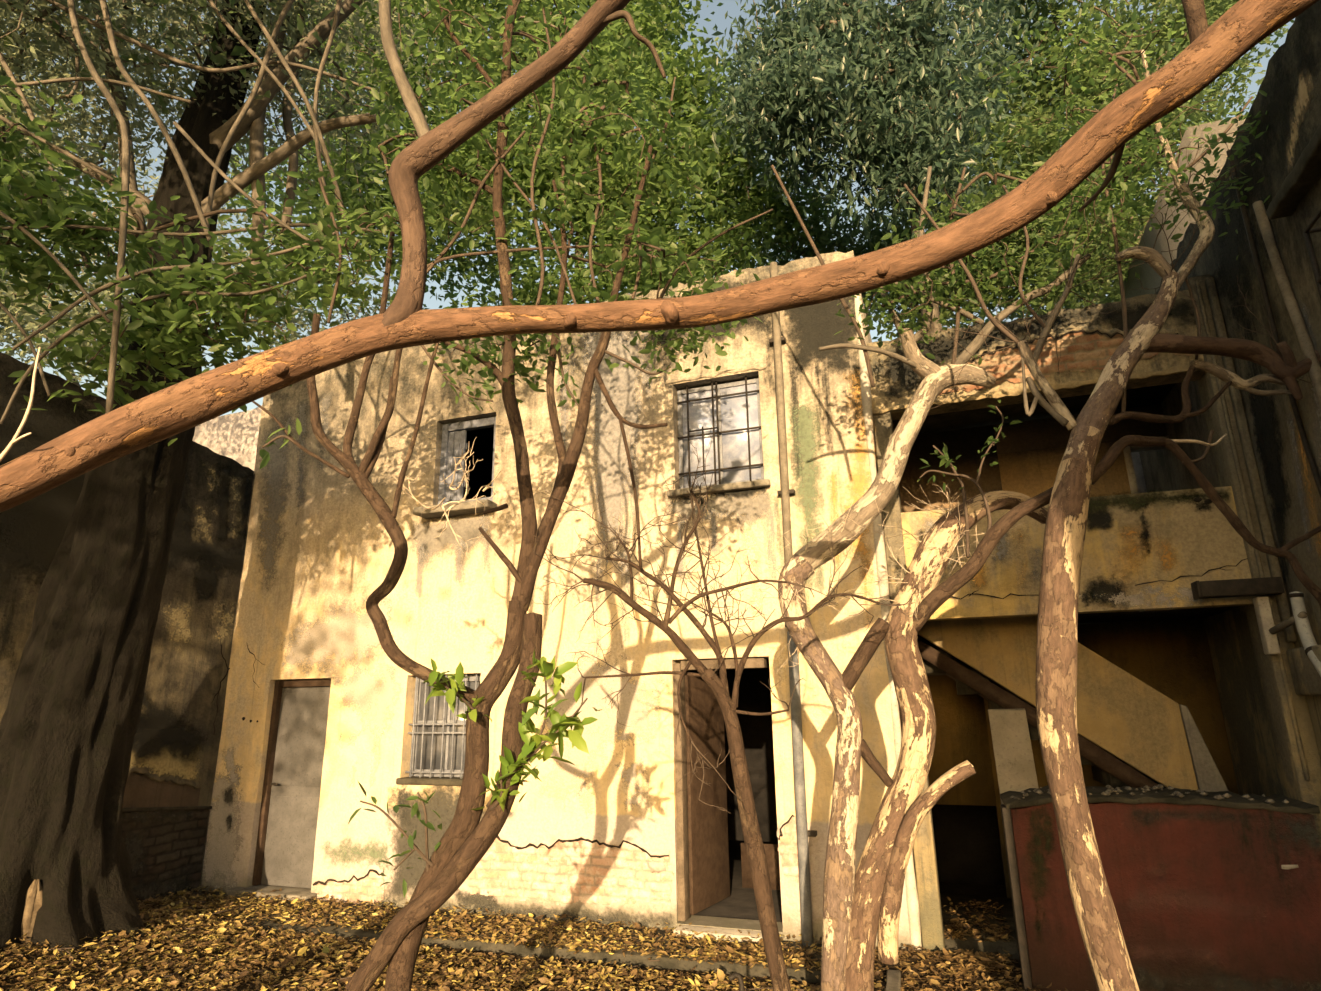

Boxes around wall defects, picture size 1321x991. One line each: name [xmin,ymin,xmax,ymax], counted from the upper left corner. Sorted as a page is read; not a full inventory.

water stain [704,296,862,475]
water stain [583,329,687,607]
water stain [666,487,783,580]
water stain [1079,579,1214,609]
water stain [1087,489,1229,554]
crack [1135,558,1248,586]
peeling [533,651,658,814]
flaking render [123,747,201,808]
flaking render [313,863,385,905]
flaking render [464,829,674,906]